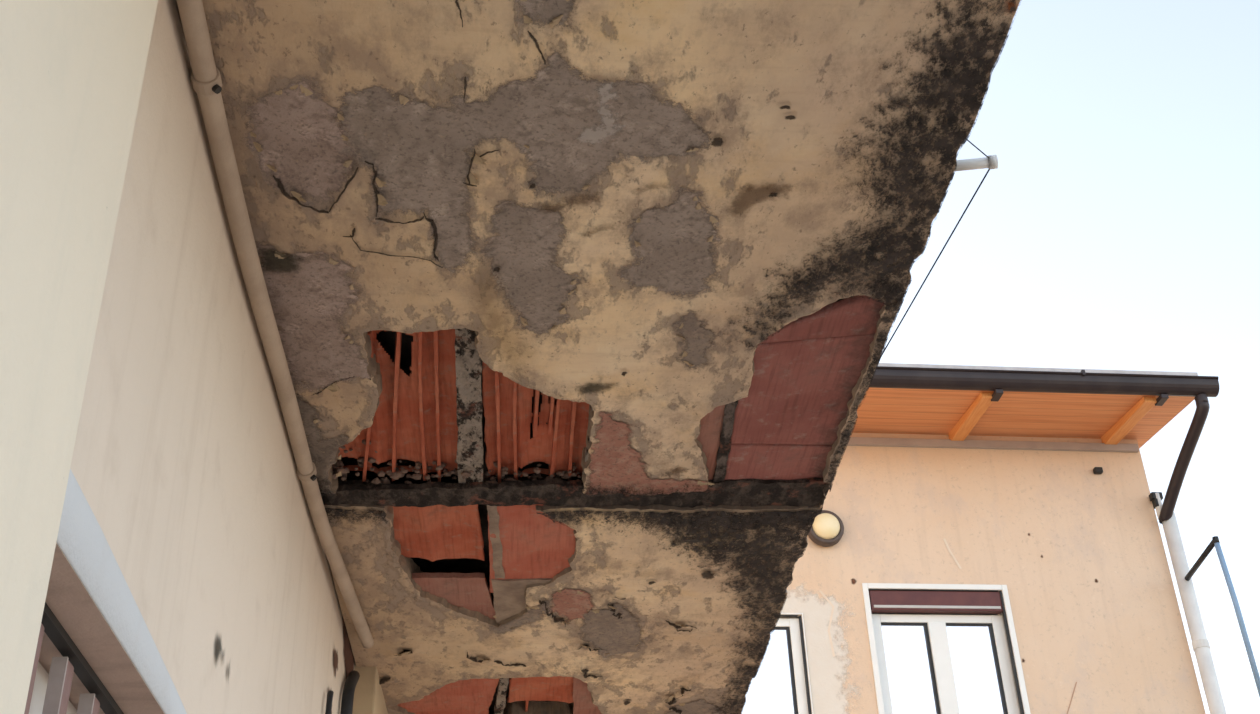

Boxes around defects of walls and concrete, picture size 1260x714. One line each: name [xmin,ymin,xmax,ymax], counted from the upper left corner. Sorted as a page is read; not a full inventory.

peeling [514,0,575,28]
crack [273,161,443,268]
peeling [244,48,723,335]
peeling [617,187,721,368]
leakage [537,0,1017,714]
leakage [318,479,388,526]
spalling [255,241,885,658]
spalling [388,676,602,714]